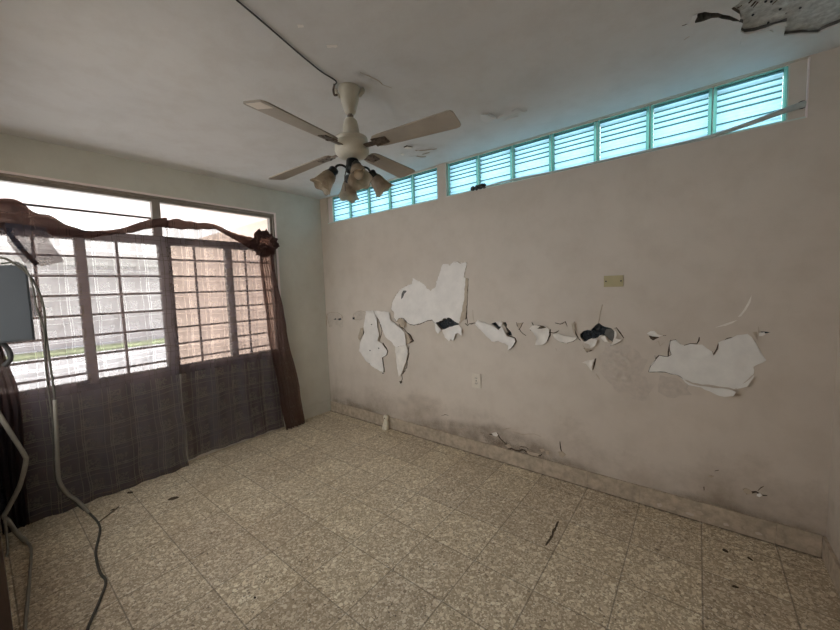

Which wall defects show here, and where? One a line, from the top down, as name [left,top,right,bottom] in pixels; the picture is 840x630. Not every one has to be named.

flaking render [732,0,840,49]
peeling [358,261,516,383]
flaking render [529,304,624,379]
peeling [647,327,770,397]